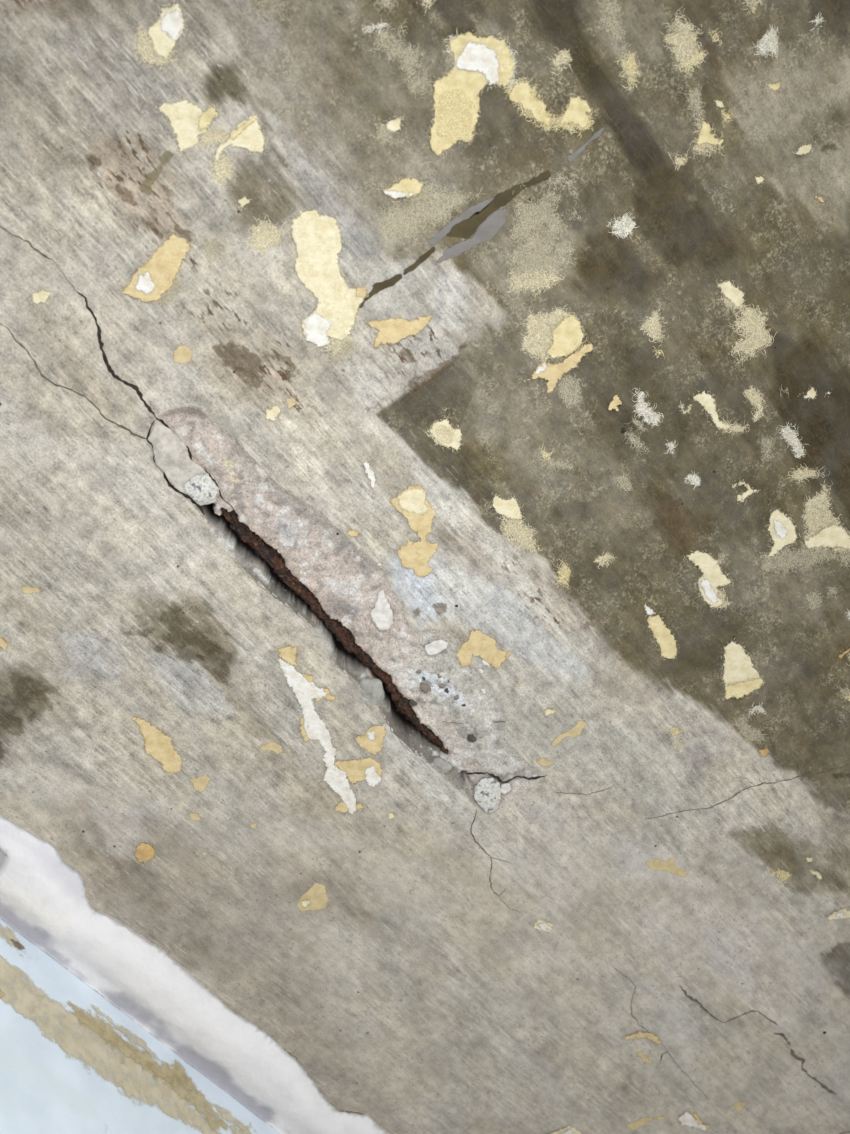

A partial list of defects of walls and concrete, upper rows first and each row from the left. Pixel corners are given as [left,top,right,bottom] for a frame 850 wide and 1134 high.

water stain [359,247,435,308]
crack [0,226,234,515]
spalling [147,406,544,814]
crack [466,772,615,795]
peeling [0,815,390,1134]
crack [615,968,710,1101]
crack [675,976,837,1095]